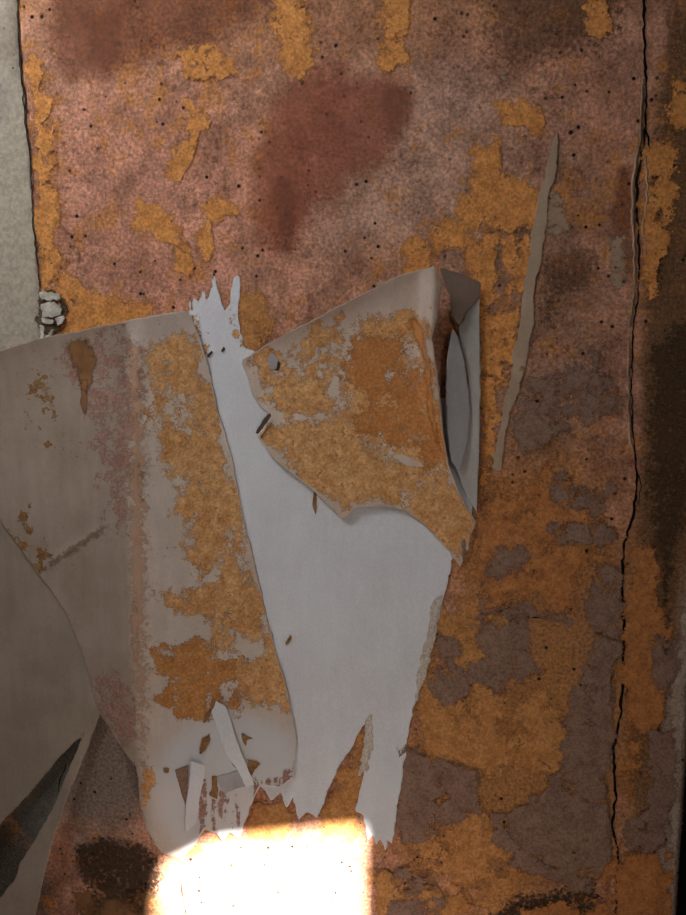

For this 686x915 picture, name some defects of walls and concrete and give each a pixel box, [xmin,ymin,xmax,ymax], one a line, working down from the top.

leakage [256,71,406,241]
flaking render [34,287,70,338]
corrosion [68,339,96,413]
crack [611,0,651,913]
corrosion [126,345,149,741]
peeling [395,467,627,894]
peeling [10,738,80,843]
peeling [199,779,208,834]
corrosion [199,733,210,754]
corrosion [209,776,218,799]
corrosion [247,759,260,776]
peeling [647,595,686,915]